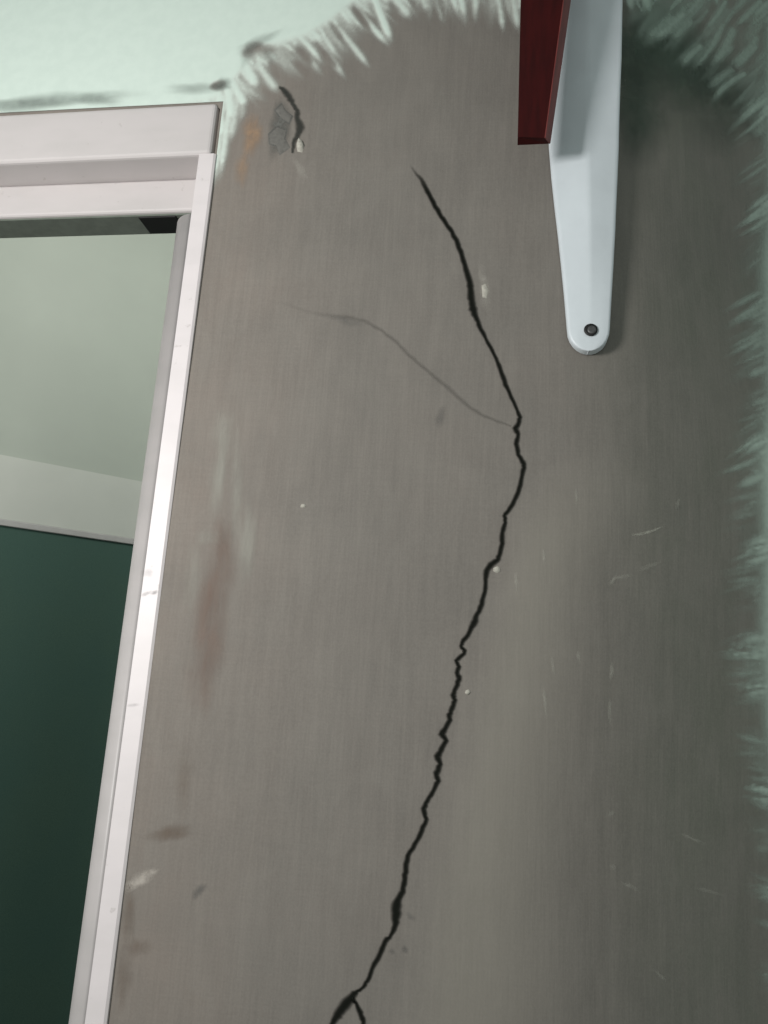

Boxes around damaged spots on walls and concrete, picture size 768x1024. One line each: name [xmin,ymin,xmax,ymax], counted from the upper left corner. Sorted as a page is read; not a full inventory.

flaking render [268,87,304,155]
crack [330,176,526,1024]